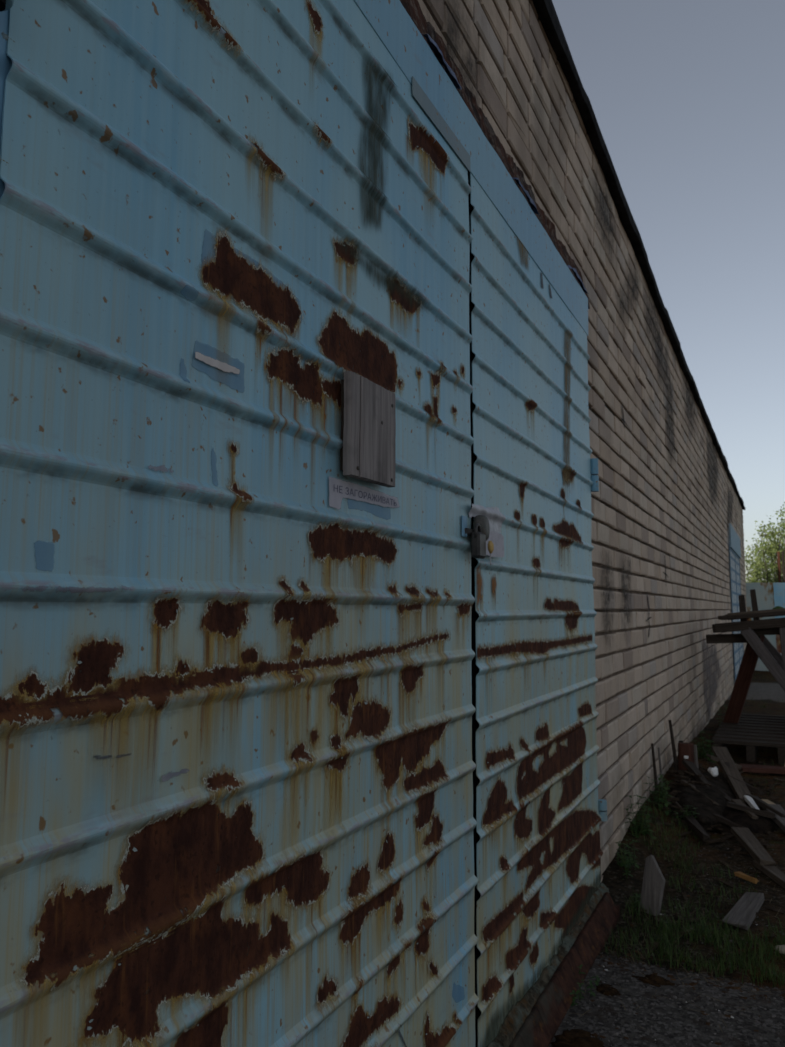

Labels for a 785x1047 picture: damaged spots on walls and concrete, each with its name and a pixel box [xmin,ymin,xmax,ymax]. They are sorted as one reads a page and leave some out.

rust [185,0,241,54]
rust [407,119,449,178]
rust [388,277,422,321]
rust [201,230,404,461]
rust [416,361,465,425]
rust [308,521,397,608]
rust [388,566,497,622]
rust [0,578,452,872]
rust [482,701,603,1007]
rust [18,765,331,1047]
rust [424,1010,472,1047]